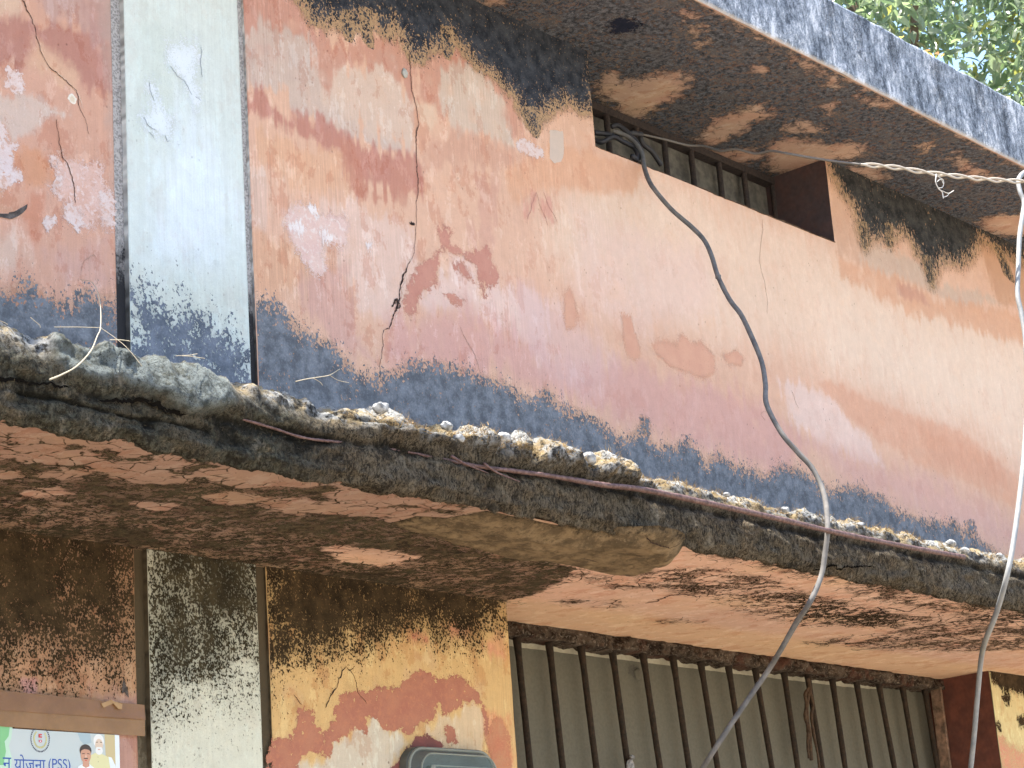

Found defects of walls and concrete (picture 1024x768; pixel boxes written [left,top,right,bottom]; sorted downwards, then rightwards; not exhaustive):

peeling [4,65,26,95]
crack [22,0,89,133]
peeling [0,117,24,193]
crack [56,120,76,203]
peeling [42,148,118,235]
crack [379,55,419,378]
damp [285,0,1024,295]
damp [0,262,117,348]
spalling [0,322,1024,613]
damp [130,265,997,554]
damp [0,434,1024,749]
peeling [266,668,513,768]